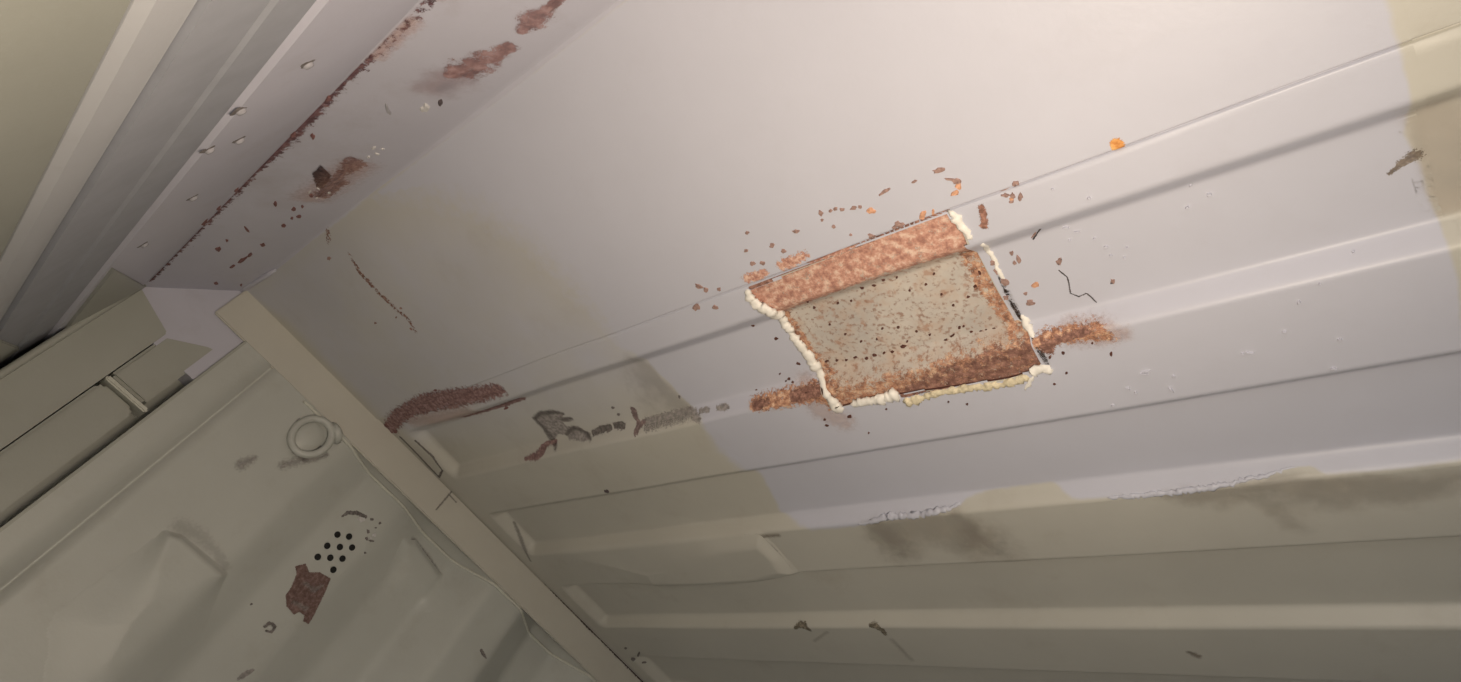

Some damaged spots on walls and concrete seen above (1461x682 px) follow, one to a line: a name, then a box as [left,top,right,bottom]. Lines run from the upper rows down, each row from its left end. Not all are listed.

rust [443,0,564,80]
rust [149,0,437,282]
rust [692,284,721,311]
rust [739,167,1118,427]
spalling [825,323,996,363]
rust [384,382,526,434]
peeling [524,395,730,462]